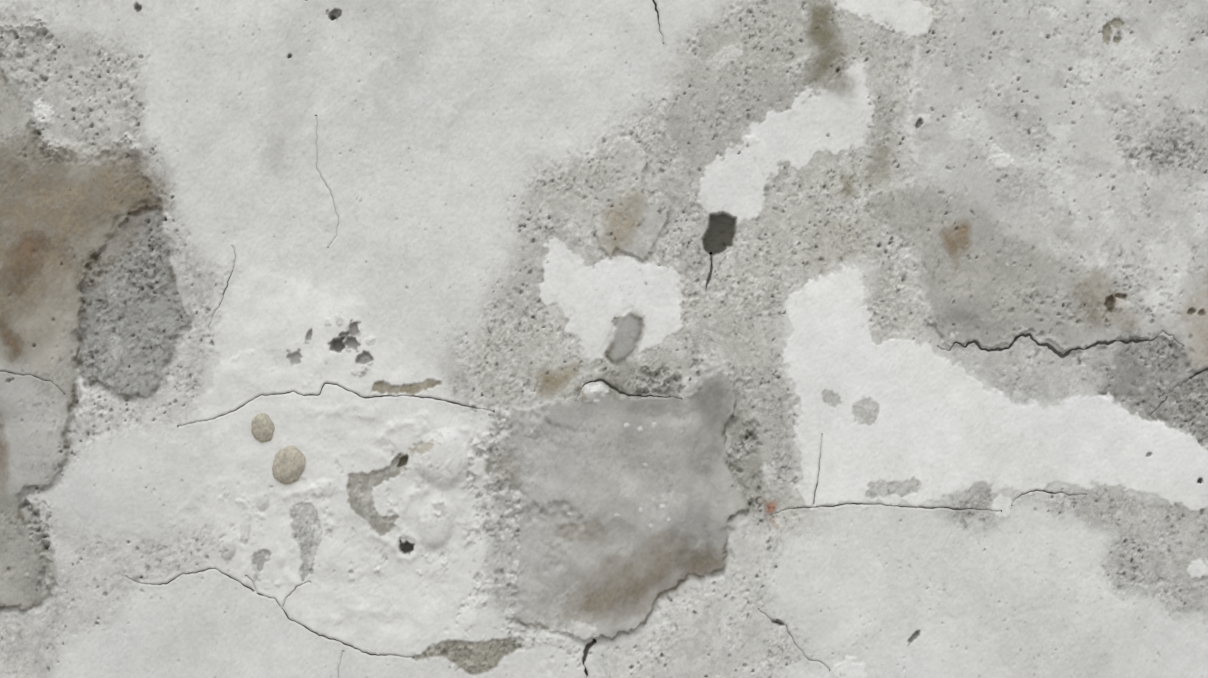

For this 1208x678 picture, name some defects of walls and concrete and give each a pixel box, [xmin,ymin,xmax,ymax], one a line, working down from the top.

crack [649,0,666,44]
leakage [0,166,151,327]
spalling [0,4,229,678]
crack [178,380,494,429]
crack [573,376,681,402]
peeling [372,0,1208,678]
crack [937,329,1208,415]
crack [770,434,1085,517]
crack [124,565,414,678]
crack [579,639,597,678]
crack [756,608,831,672]